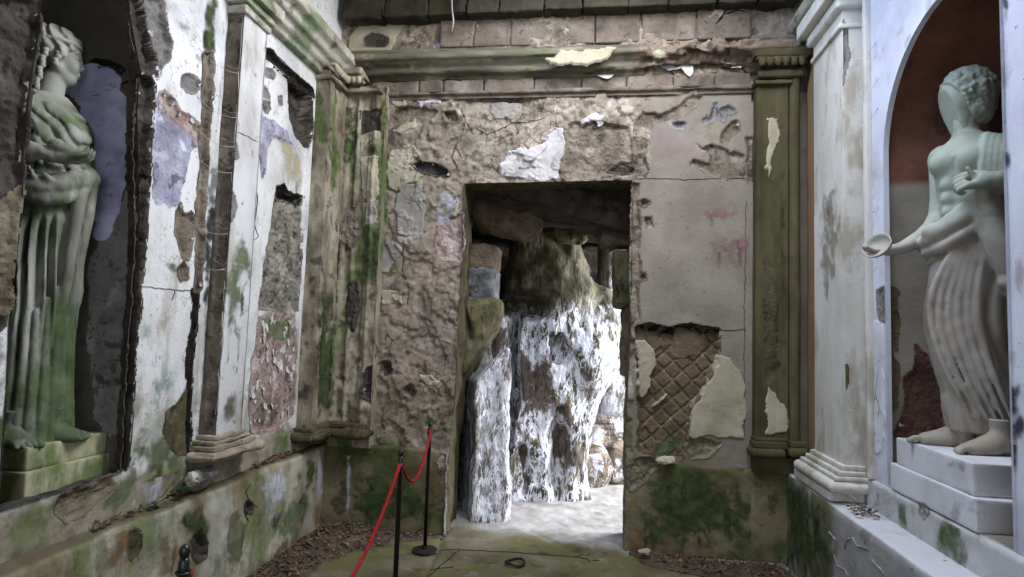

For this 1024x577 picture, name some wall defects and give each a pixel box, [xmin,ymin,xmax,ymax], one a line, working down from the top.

flaking render [260,47,315,179]
flaking render [410,160,451,178]
crack [450,108,544,167]
flaking render [54,0,240,525]
flaking render [248,183,305,435]
flaking render [558,93,753,492]
flaking render [876,285,943,438]